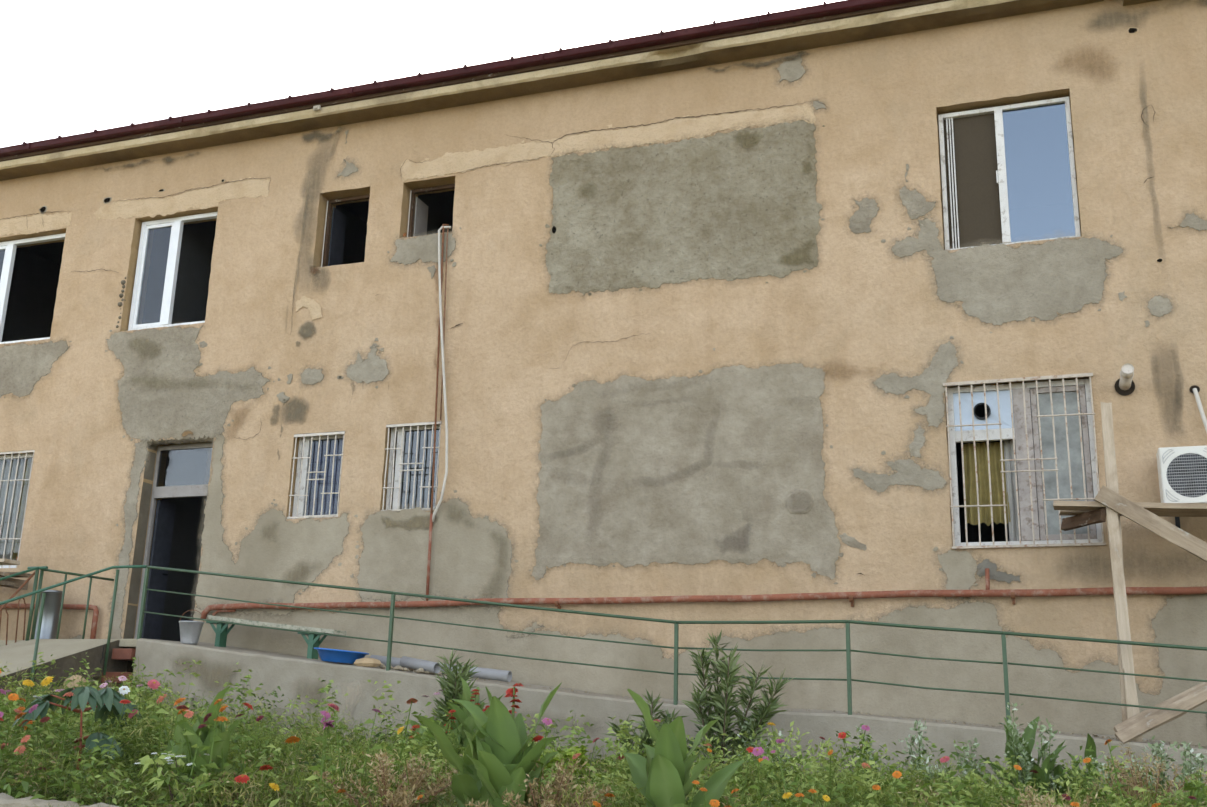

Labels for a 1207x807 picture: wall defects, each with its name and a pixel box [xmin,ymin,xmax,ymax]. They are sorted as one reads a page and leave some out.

crack [462,101,827,172]
flaking render [849,164,1123,333]
flaking render [0,340,72,398]
flaking render [105,277,389,537]
flaking render [852,336,964,493]